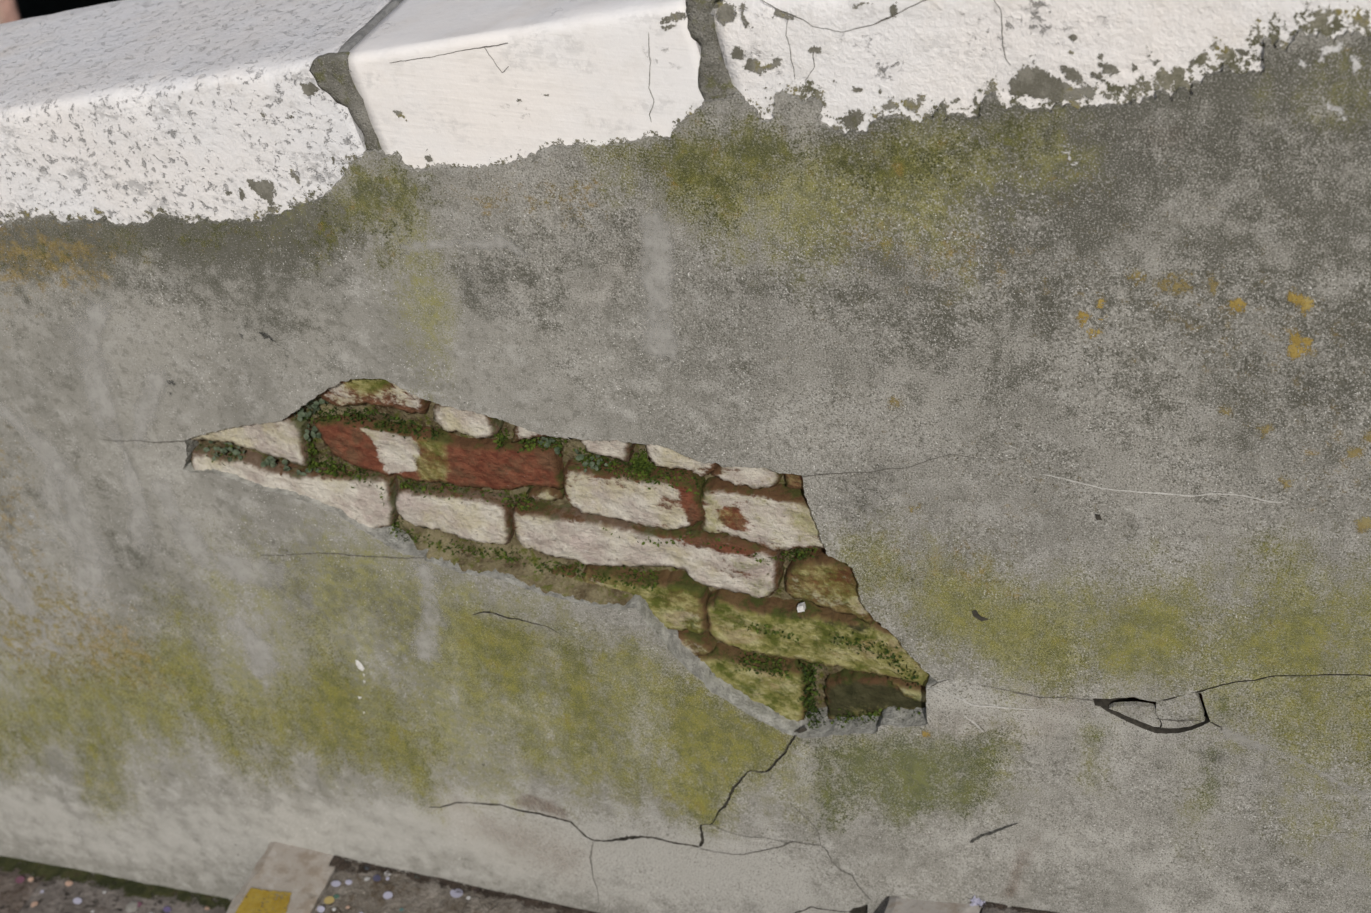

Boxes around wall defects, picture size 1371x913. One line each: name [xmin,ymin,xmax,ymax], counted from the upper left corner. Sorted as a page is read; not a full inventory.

peeling [716,0,753,31]
crack [762,0,926,93]
peeling [730,1,1371,131]
spalling [183,378,1004,738]
water stain [413,564,447,661]
crack [931,679,1094,733]
crack [700,728,872,901]
crack [589,835,640,904]